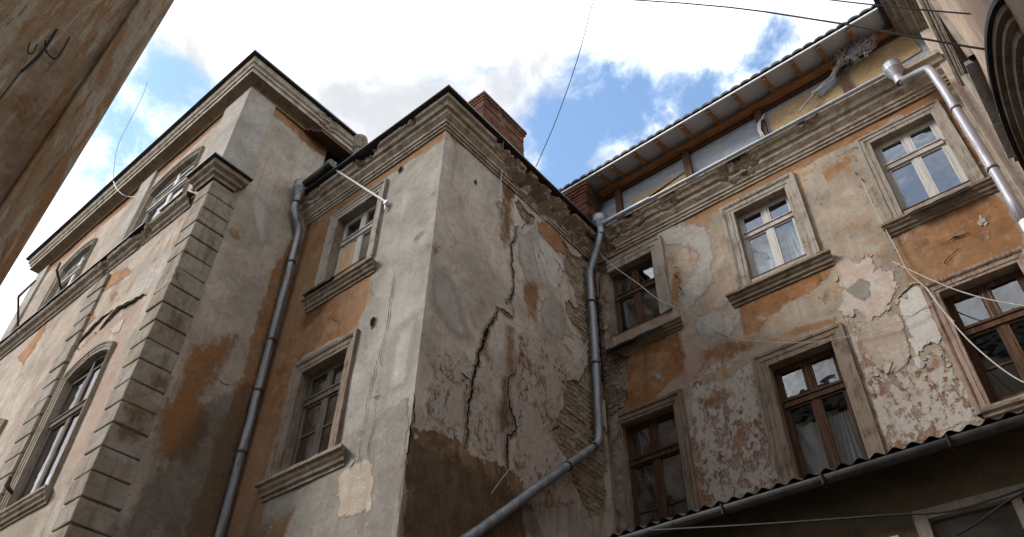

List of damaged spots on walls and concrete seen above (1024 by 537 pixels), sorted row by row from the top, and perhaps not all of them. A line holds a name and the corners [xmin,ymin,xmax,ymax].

water stain [155,335,238,460]
flaking render [336,456,374,517]
crack [446,197,570,449]
crack [503,367,521,488]
flaking render [514,201,606,518]
flaking render [656,222,717,314]
peeling [689,373,776,509]
peeling [833,253,985,452]
crack [940,232,969,264]